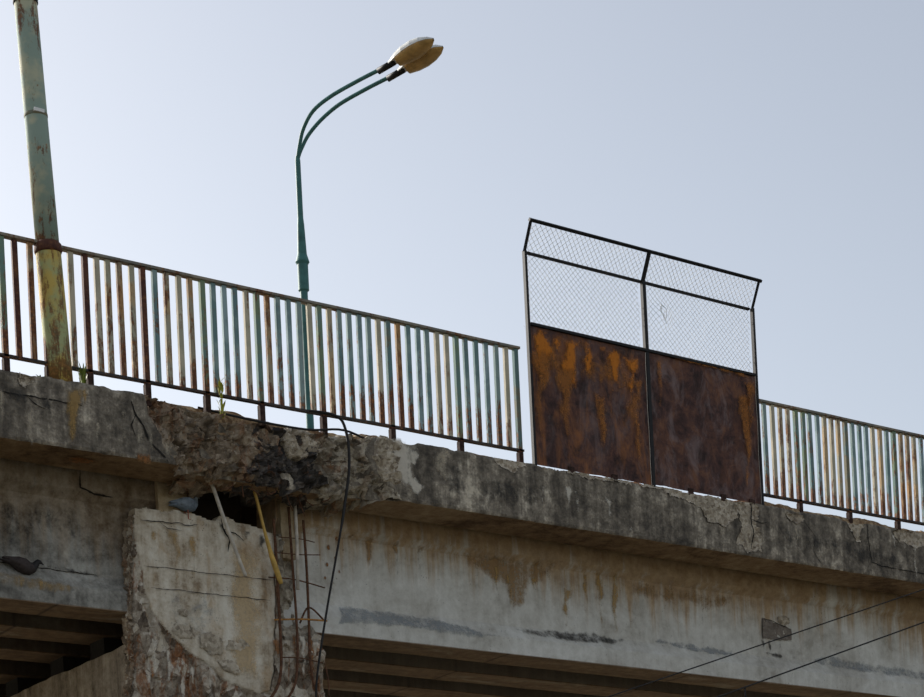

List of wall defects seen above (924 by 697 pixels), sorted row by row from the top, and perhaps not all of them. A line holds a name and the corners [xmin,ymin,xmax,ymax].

crack [131,401,168,461]
rust [533,332,642,455]
rust [677,355,754,458]
crack [79,473,111,498]
spalling [566,470,762,553]
spalling [121,394,422,697]
crack [867,526,924,574]
water stain [340,609,482,636]
water stain [527,630,614,644]